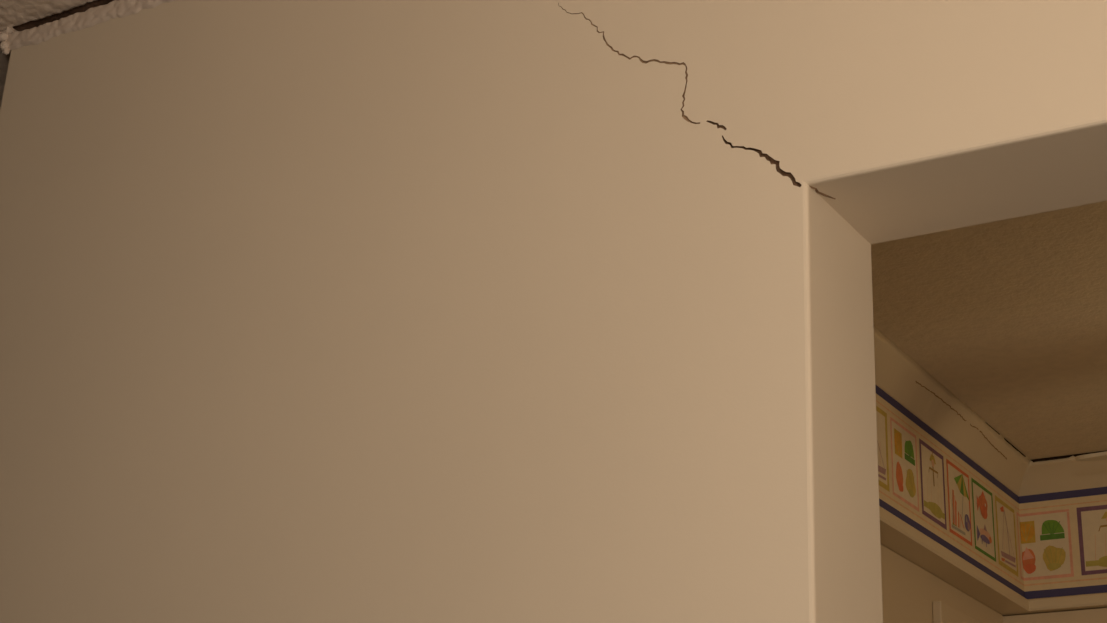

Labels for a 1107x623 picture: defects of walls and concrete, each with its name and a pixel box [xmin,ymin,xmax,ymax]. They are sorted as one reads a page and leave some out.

crack [562,8,836,199]